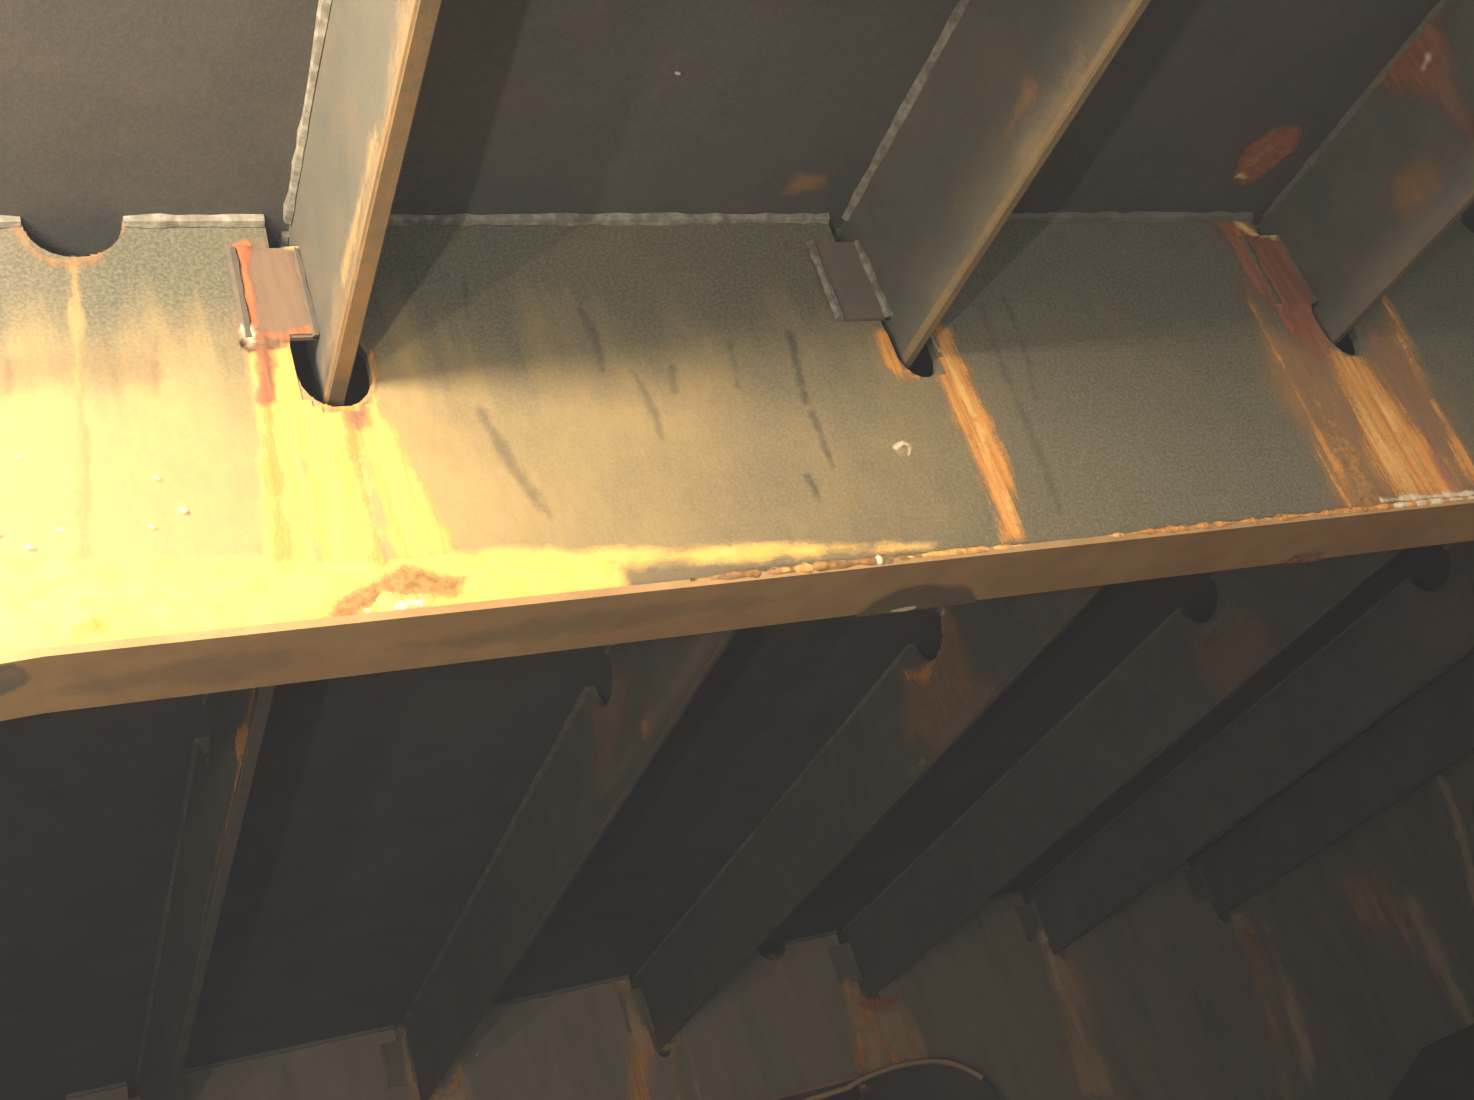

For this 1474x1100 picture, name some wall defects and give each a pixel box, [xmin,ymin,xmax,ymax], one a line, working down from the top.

rust [1234,128,1300,185]
rust [1382,21,1474,133]
rust [235,241,453,572]
rust [688,325,1023,582]
rust [1105,221,1474,537]